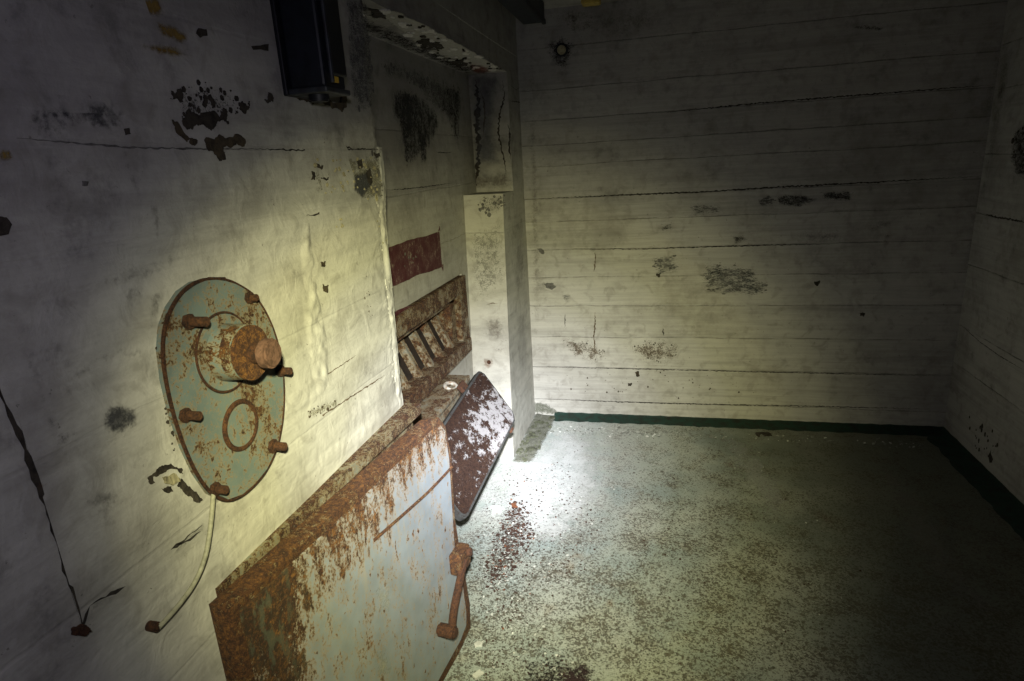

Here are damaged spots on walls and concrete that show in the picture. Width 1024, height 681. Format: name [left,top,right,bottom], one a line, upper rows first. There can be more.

peeling [170,79,250,161]
damp [384,64,461,163]
crack [473,80,520,186]
spalling [311,147,404,407]
damp [106,407,135,431]
rust [161,277,285,502]
spalling [148,464,203,503]